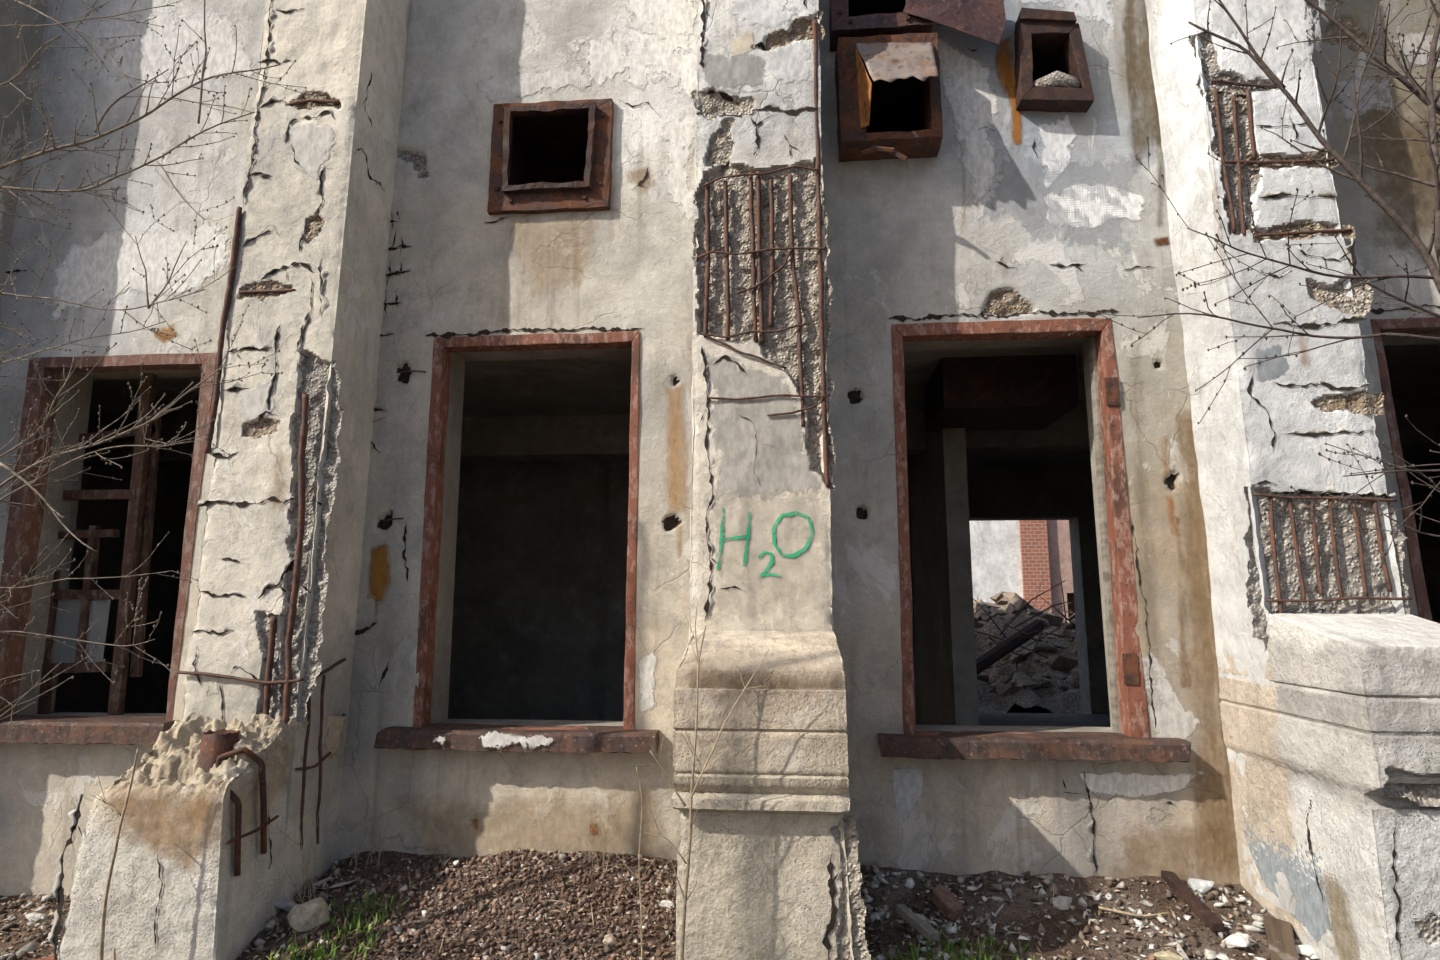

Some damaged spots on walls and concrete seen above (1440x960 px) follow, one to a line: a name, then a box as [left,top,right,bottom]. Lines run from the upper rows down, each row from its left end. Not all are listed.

corrosion [996,39,1021,144]
spalling [1188,0,1377,243]
peeling [1394,32,1440,69]
crack [222,0,643,420]
spalling [476,0,836,500]
crack [207,447,239,458]
spalling [239,353,344,724]
crack [700,348,766,621]
spalling [1243,486,1412,640]
crack [47,793,120,960]
crack [821,854,838,960]
crack [1391,821,1402,959]